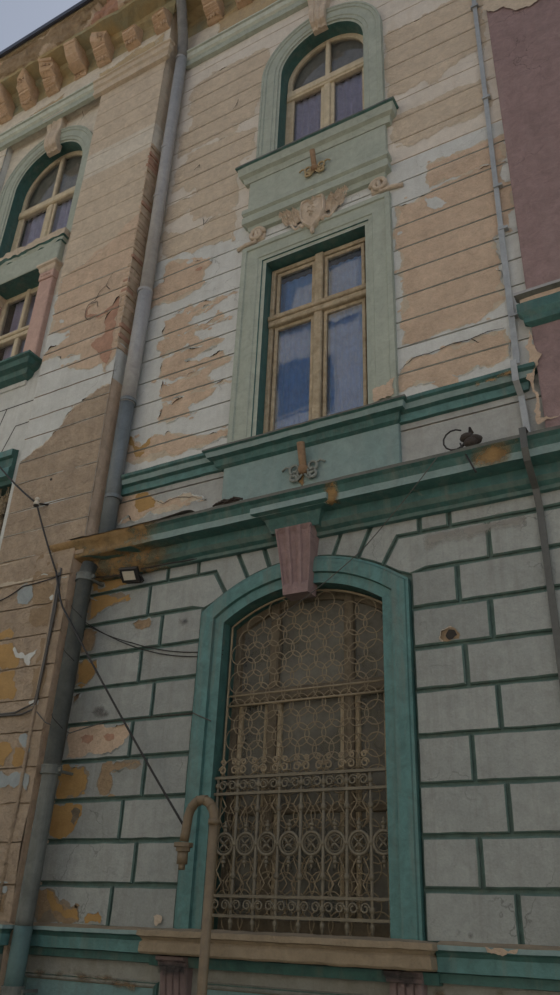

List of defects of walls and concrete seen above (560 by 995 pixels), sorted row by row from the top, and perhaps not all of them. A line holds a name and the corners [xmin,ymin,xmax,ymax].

peeling [42,143,161,372]
peeling [126,48,270,465]
peeling [372,133,514,402]
peeling [0,384,110,706]
corrosion [49,523,160,582]
peeling [75,579,131,688]
peeling [0,733,30,790]
spalling [49,721,141,839]
peeling [34,887,103,925]